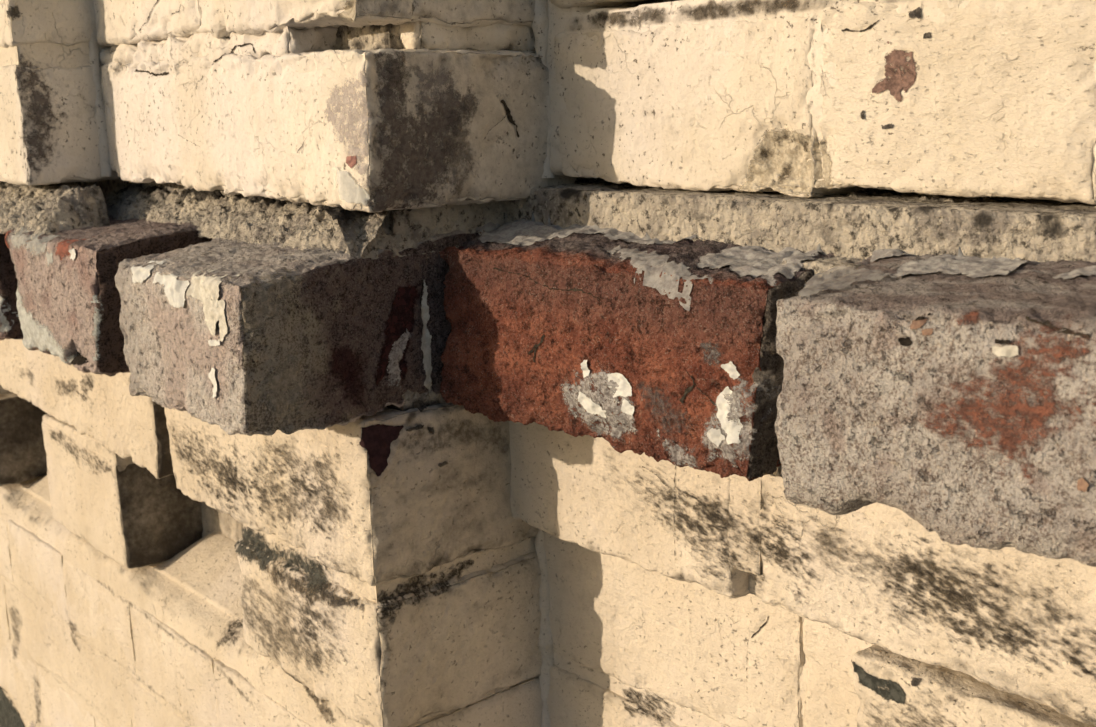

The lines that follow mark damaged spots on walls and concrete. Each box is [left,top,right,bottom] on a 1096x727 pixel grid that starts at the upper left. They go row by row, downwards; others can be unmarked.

crack [135,68,169,76]
crack [196,43,255,89]
crack [485,100,519,138]
peeling [872,41,918,102]
peeling [131,257,305,346]
peeling [476,213,1028,311]
peeling [561,360,638,441]
peeling [702,361,781,467]
water stain [172,428,350,532]
water stain [640,477,742,577]
water stain [218,556,358,672]
water stain [880,539,1057,671]